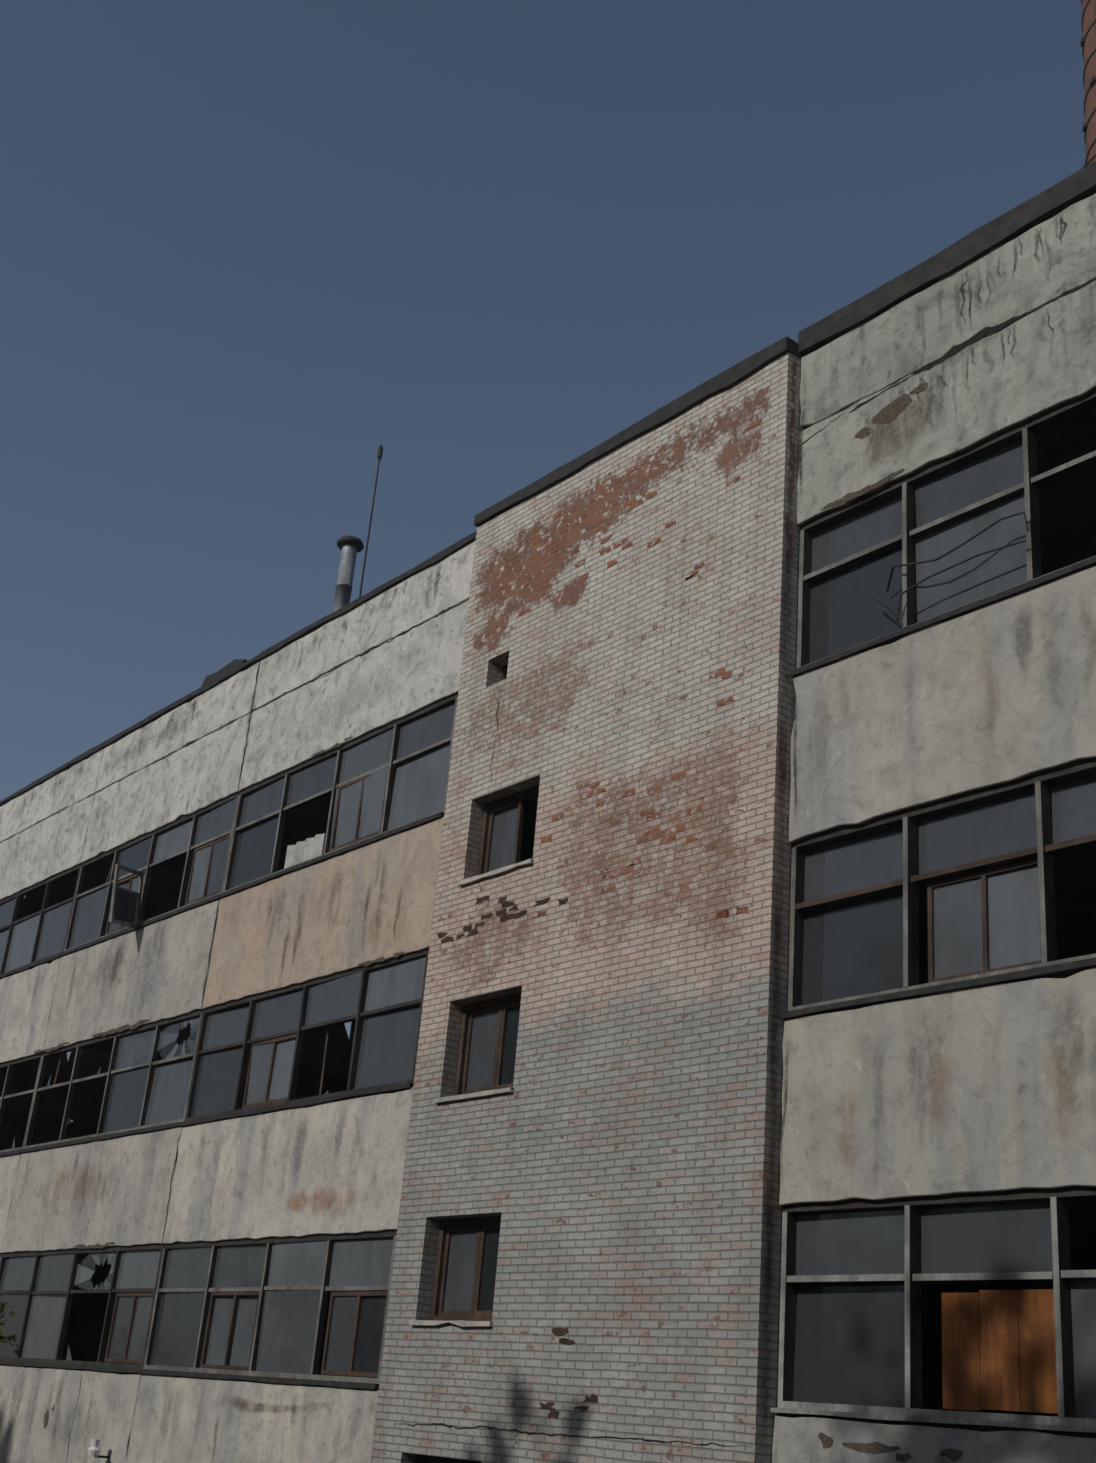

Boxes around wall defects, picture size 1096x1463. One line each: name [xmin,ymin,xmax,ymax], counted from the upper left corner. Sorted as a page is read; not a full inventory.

crack [802,277,1095,444]
peeling [473,387,769,651]
peeling [784,361,797,564]
spalling [709,668,734,706]
peeling [437,754,749,982]